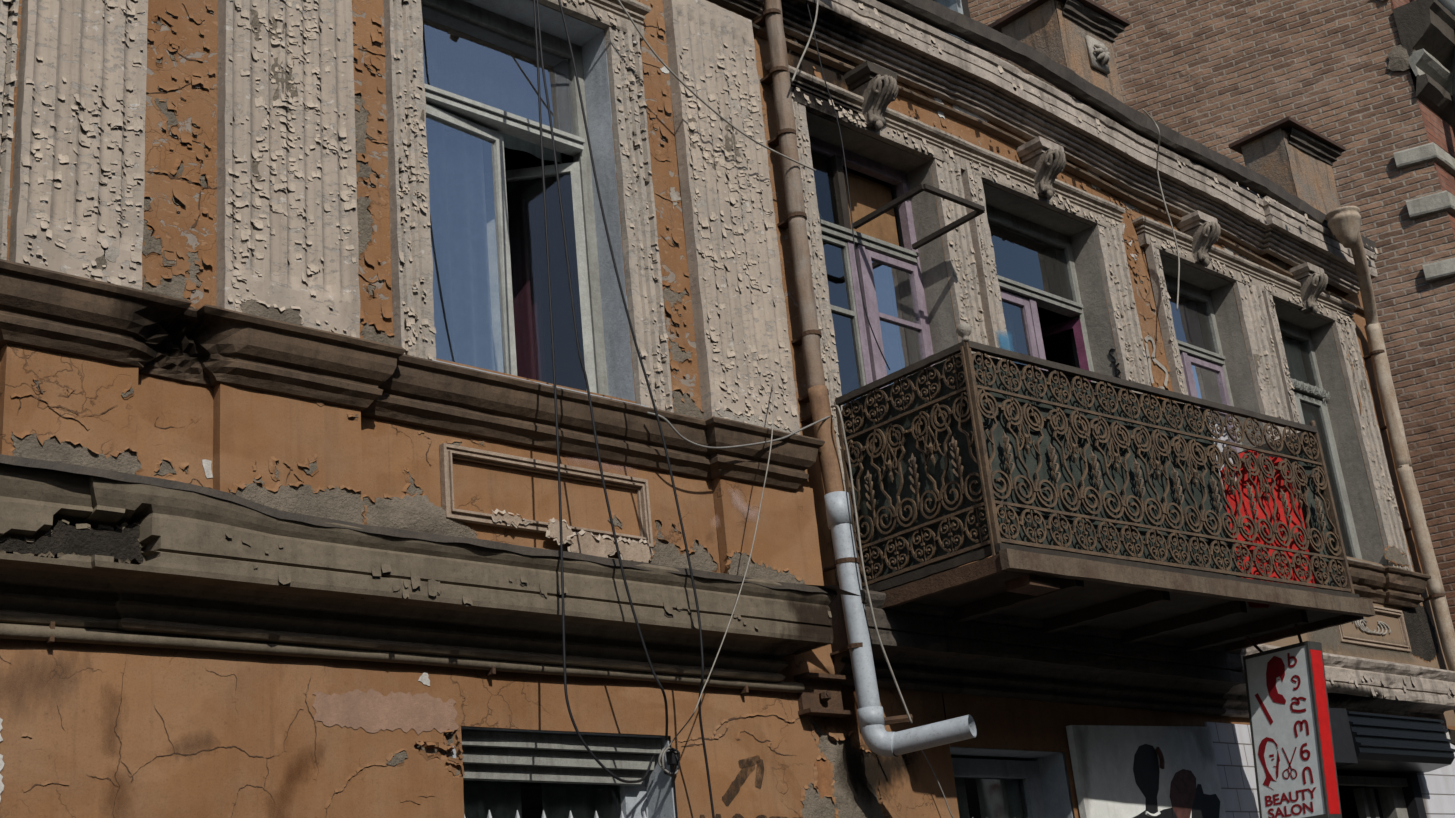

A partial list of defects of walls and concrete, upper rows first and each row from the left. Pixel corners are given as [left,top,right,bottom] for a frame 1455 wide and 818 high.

peeling [858,3,943,55]
peeling [563,0,798,434]
peeling [791,87,867,449]
peeling [888,97,1194,404]
peeling [1207,175,1309,227]
crack [10,388,117,430]
peeling [8,429,213,481]
peeling [228,452,368,524]
flaking render [0,519,146,564]
peeling [372,560,441,599]
crack [21,661,389,818]
flaking render [799,716,891,818]